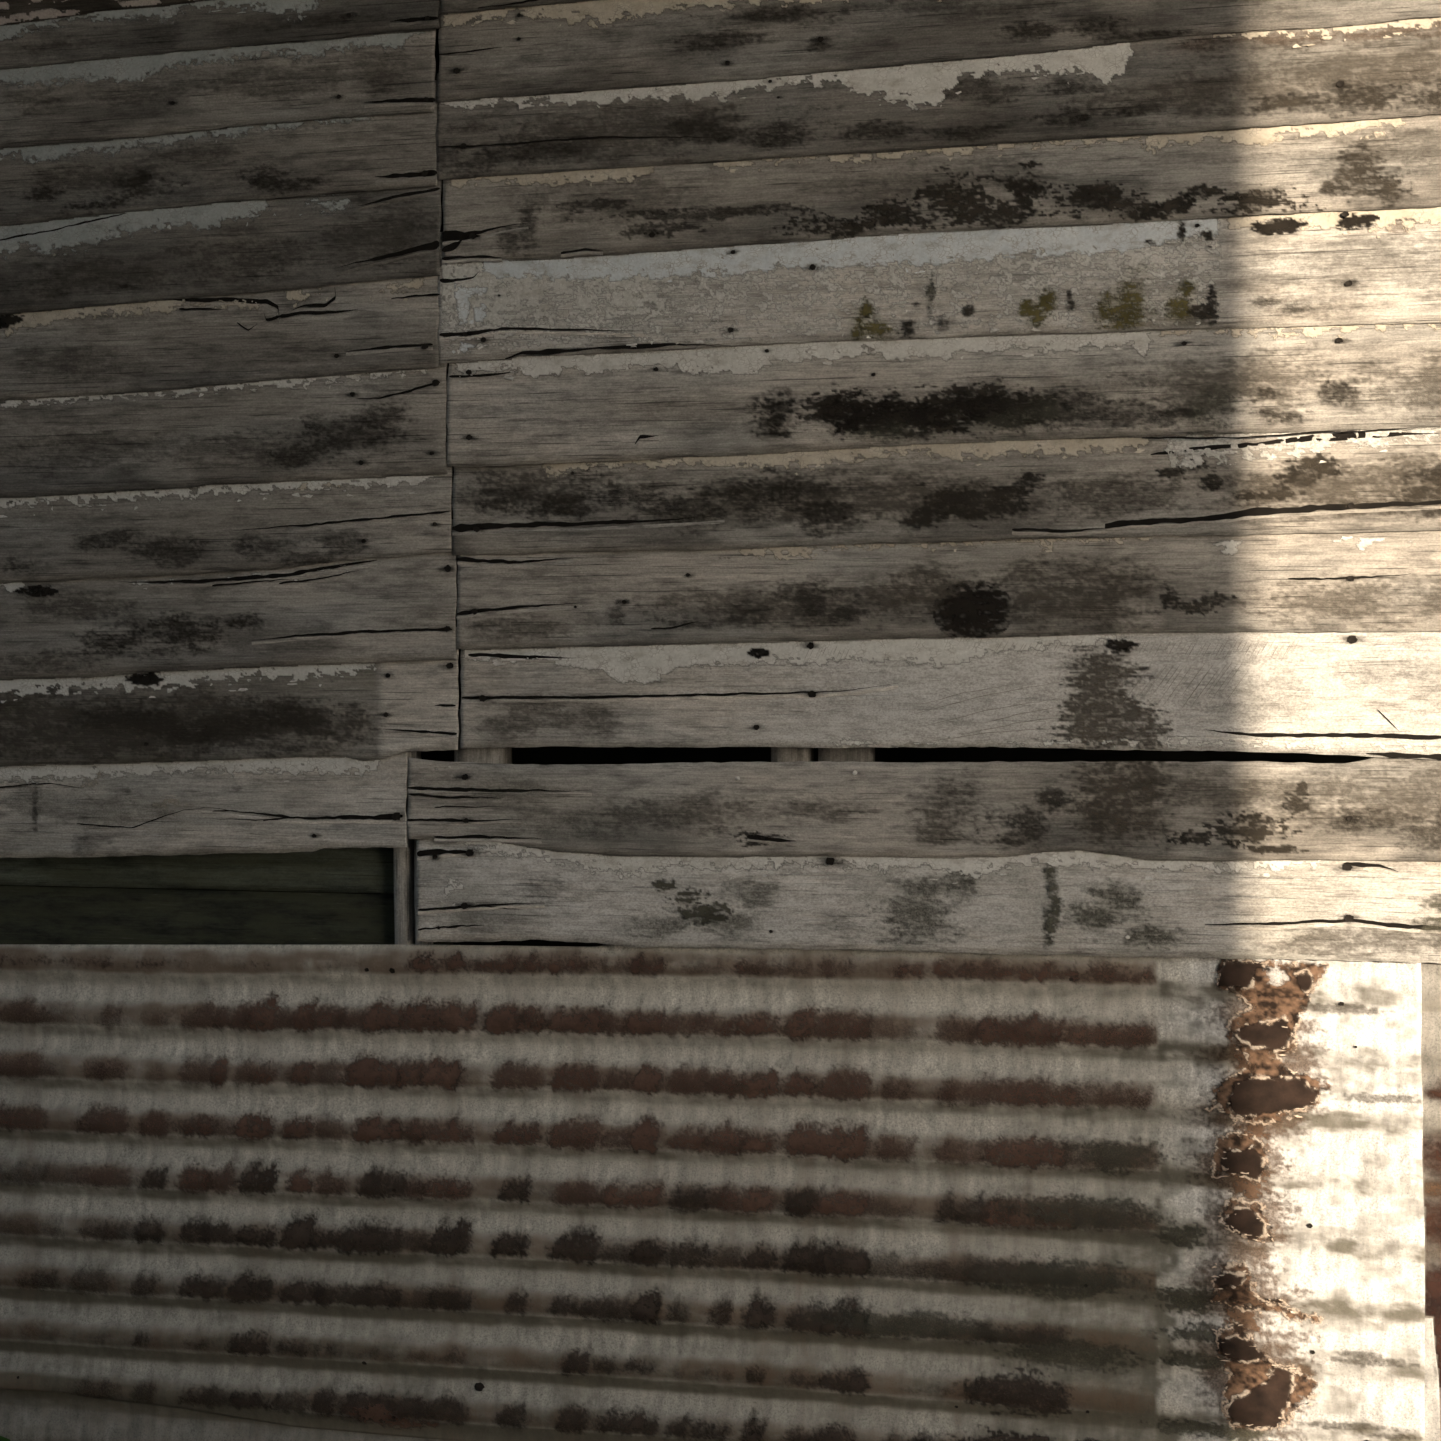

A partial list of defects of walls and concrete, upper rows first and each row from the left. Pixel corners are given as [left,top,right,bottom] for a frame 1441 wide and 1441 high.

peeling [440,42,1134,112]
water stain [556,143,1417,248]
peeling [441,207,1441,383]
crack [346,327,719,399]
water stain [752,359,1302,440]
peeling [464,635,1116,684]
water stain [657,556,1441,854]
crack [1206,709,1441,760]
crack [77,786,592,861]
rust [182,992,872,1041]
rust [1183,959,1331,1440]
rust [1426,1263,1441,1388]